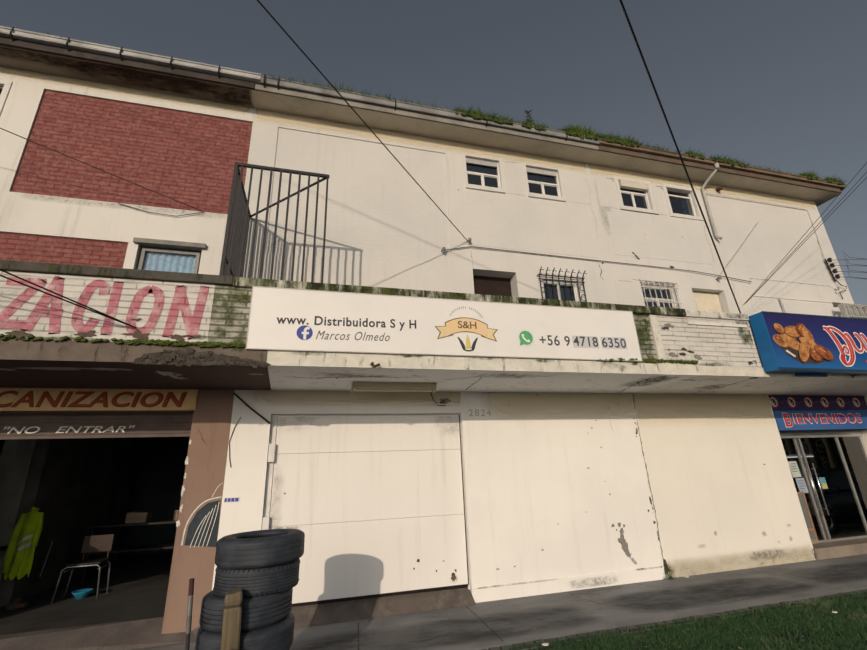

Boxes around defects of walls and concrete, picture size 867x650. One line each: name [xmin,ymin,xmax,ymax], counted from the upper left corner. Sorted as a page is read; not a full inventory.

peeling [123,318,150,340]
water stain [636,319,652,351]
spalling [0,334,271,379]
peeling [667,347,702,360]
water stain [494,376,771,412]
crack [632,395,669,576]
spalling [611,523,637,565]